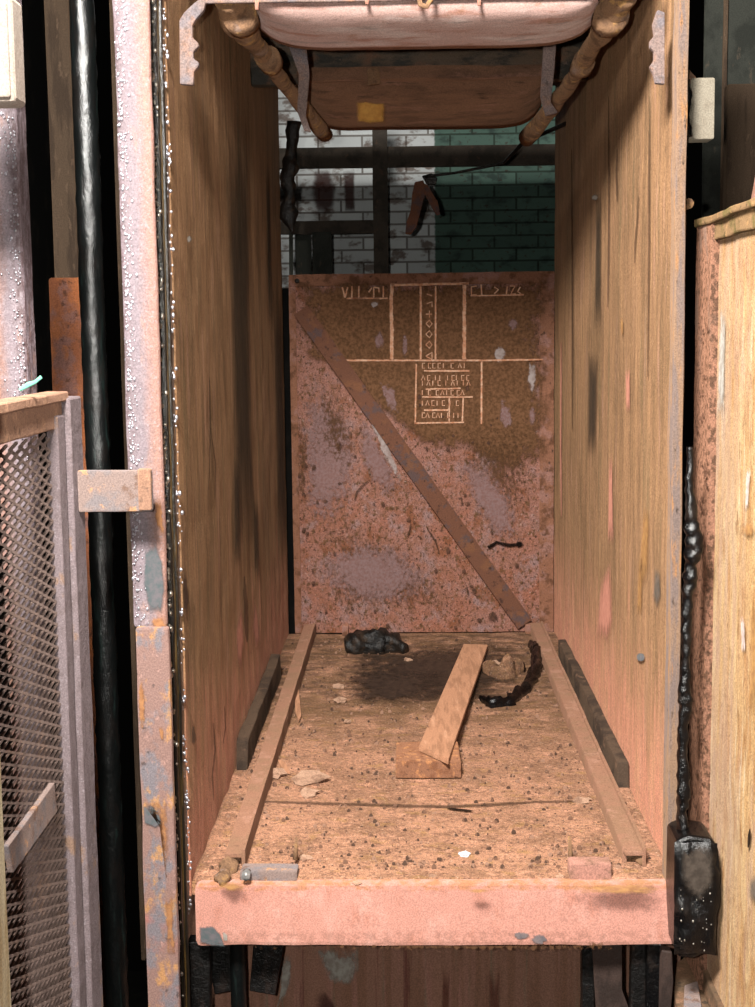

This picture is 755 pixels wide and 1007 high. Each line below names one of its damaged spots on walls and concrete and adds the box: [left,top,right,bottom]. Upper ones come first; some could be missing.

corrosion [298,281,547,515]
corrosion [312,527,460,629]
corrosion [150,802,167,874]
corrosion [166,899,175,952]